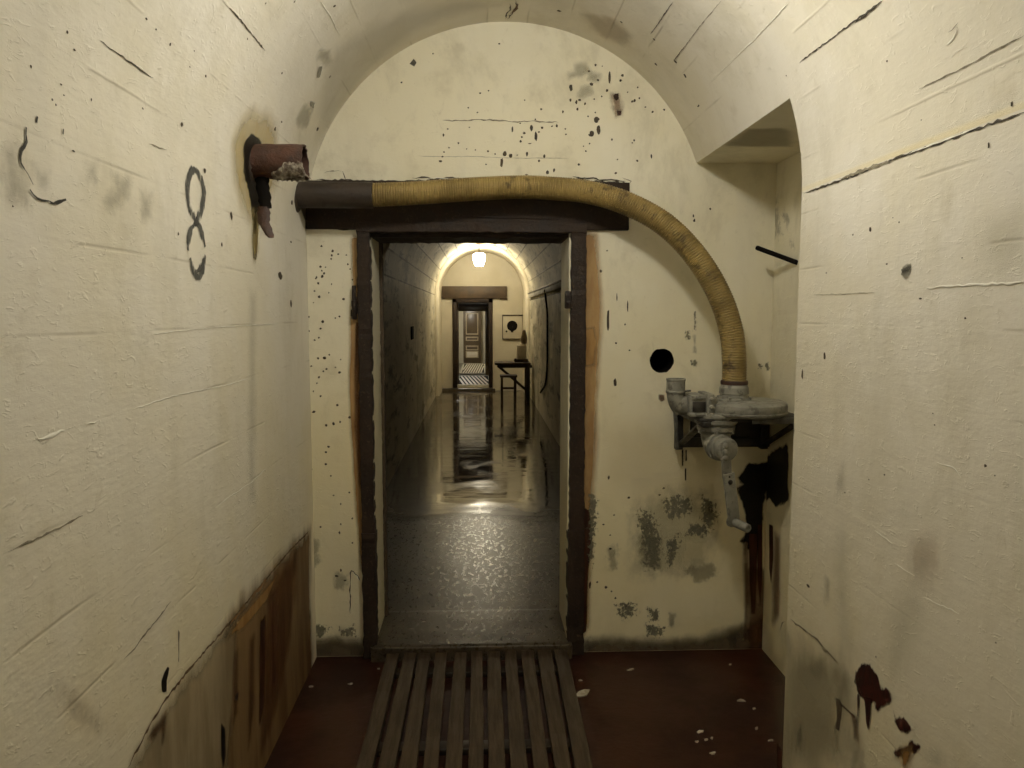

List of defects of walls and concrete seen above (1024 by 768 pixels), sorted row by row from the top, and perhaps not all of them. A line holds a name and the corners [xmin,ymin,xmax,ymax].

crack [100,40,153,78]
crack [801,0,883,61]
crack [919,36,1023,89]
rust [236,122,273,252]
crack [806,112,1024,193]
crack [11,515,83,551]
leakage [584,524,764,652]
leakage [636,494,718,570]
rust [769,524,779,618]
leakage [135,620,236,768]